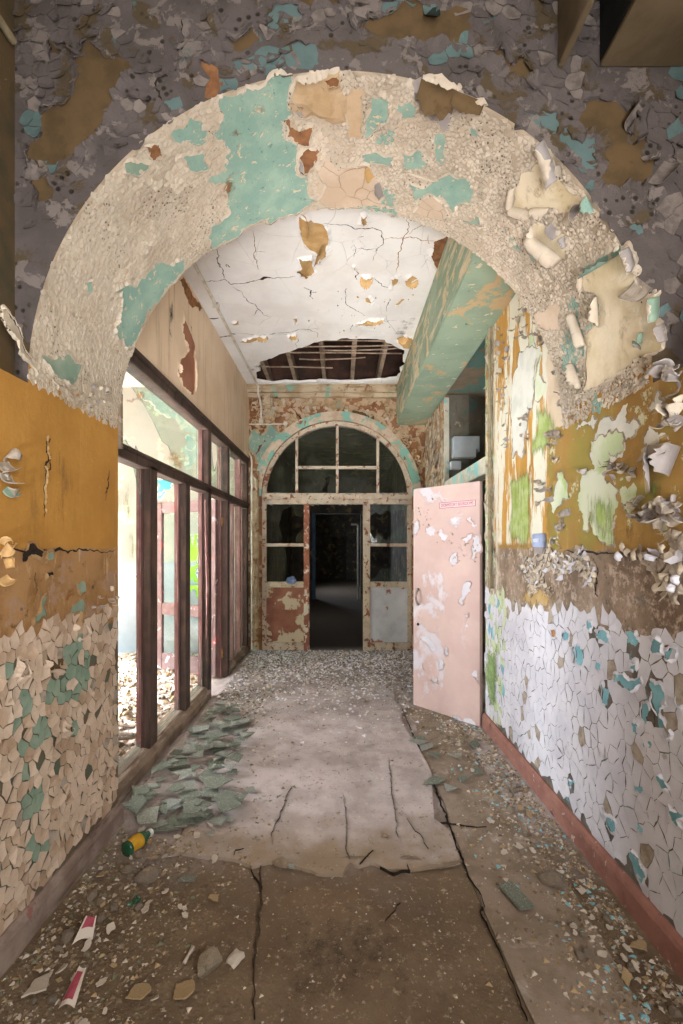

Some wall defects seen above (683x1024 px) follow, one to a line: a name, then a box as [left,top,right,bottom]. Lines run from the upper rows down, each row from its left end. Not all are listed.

crack [191,233,318,399]
peeling [0,0,683,605]
crack [330,220,430,331]
crack [43,435,52,517]
peeling [249,331,683,938]
peeling [0,541,119,936]
flaking render [96,855,133,908]
crack [234,848,263,1020]
crack [343,796,410,876]
crack [389,762,528,1022]